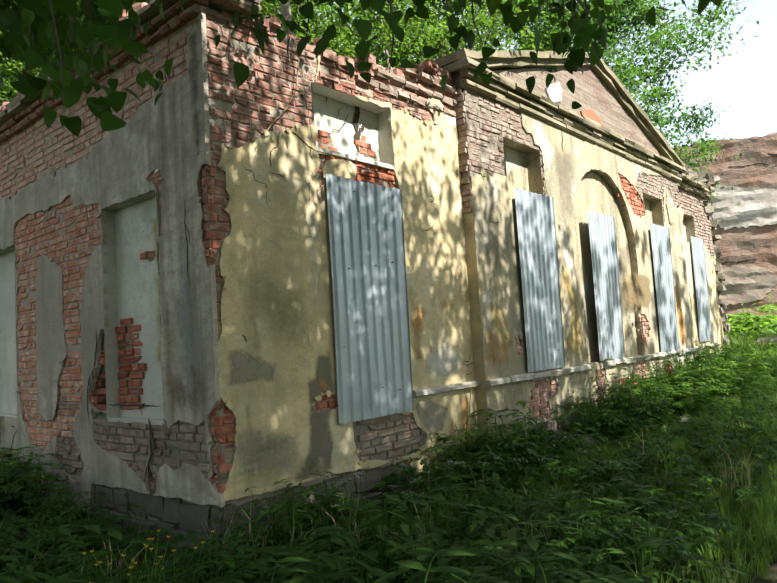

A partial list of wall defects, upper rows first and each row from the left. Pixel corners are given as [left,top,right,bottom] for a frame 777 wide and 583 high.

peeling [0,8,546,338]
peeling [615,173,715,260]
spalling [10,196,243,495]
spalling [353,413,426,468]
spalling [529,377,557,419]